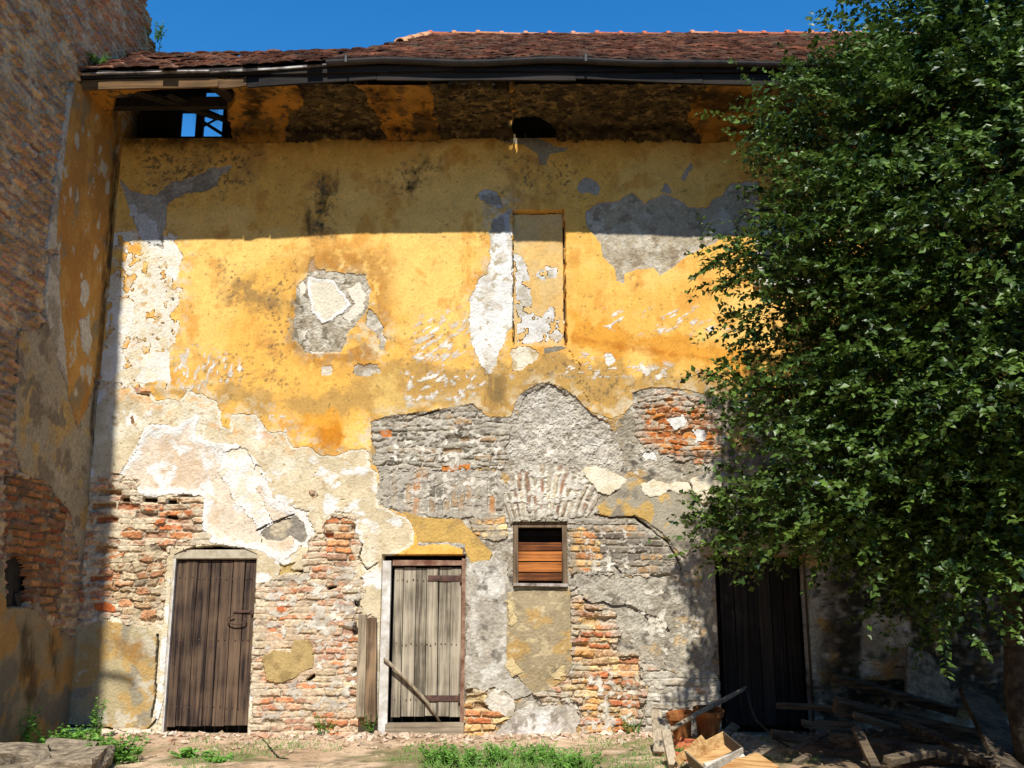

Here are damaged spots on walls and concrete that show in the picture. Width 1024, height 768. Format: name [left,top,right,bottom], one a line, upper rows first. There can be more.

peeling [0,79,833,743]
crack [256,514,295,531]
crack [596,514,681,571]
flaking render [768,518,1003,732]